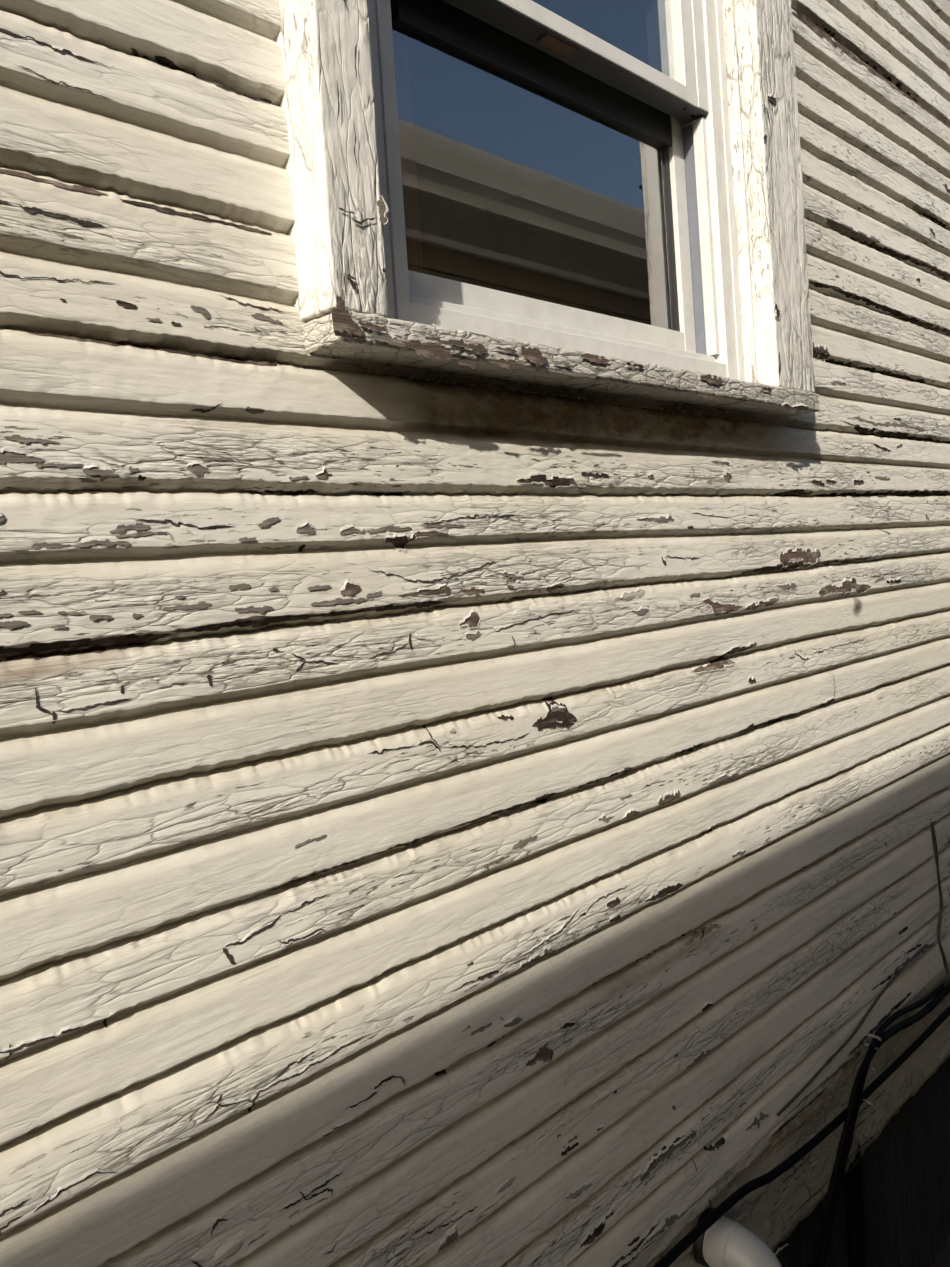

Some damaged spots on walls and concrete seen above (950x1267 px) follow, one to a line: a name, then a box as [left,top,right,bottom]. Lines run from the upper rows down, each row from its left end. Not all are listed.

peeling [332,273,610,378]
peeling [0,435,146,481]
crack [245,488,319,496]
crack [359,489,409,497]
peeling [31,517,280,549]
peeling [340,514,521,552]
peeling [366,562,524,641]
crack [35,685,131,724]
peeling [532,696,577,731]
crack [368,725,529,754]
crack [223,894,328,965]
crack [203,1033,370,1122]